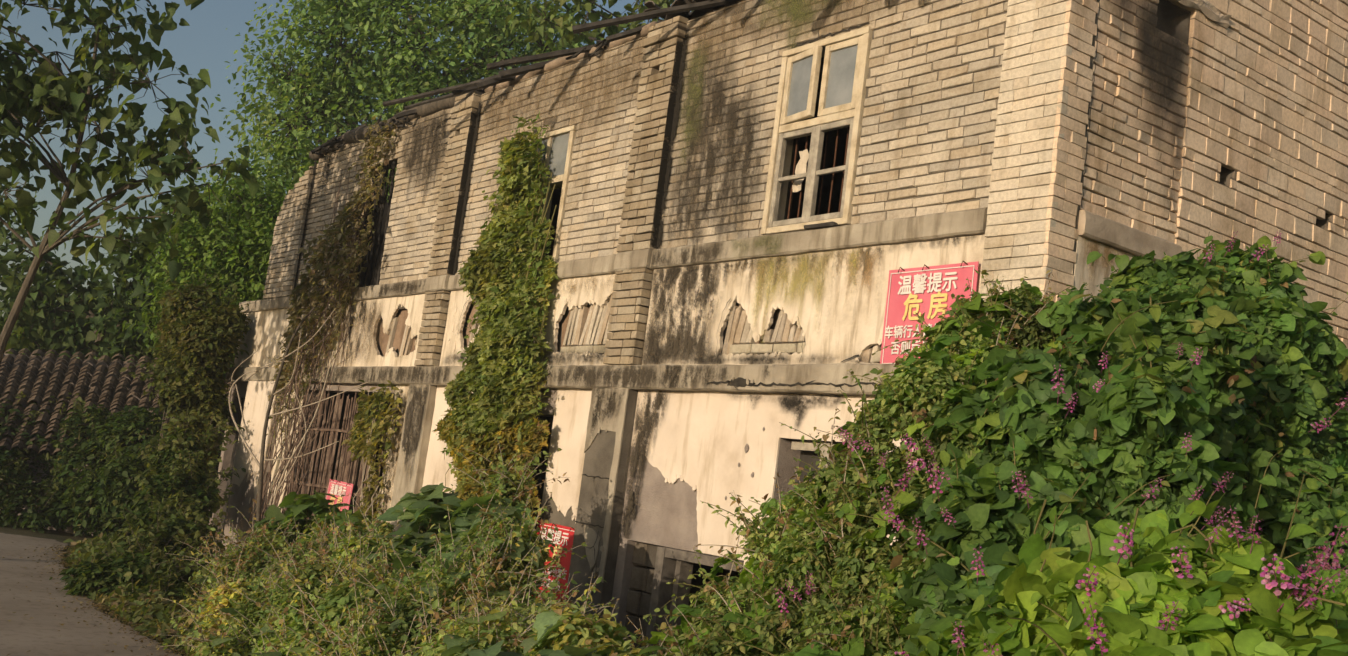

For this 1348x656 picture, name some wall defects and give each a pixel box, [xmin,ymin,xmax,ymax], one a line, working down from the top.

peeling [340,304,417,363]
peeling [553,291,615,357]
water stain [534,3,807,539]
peeling [655,269,806,357]
water stain [778,394,840,426]
peeling [542,388,698,583]